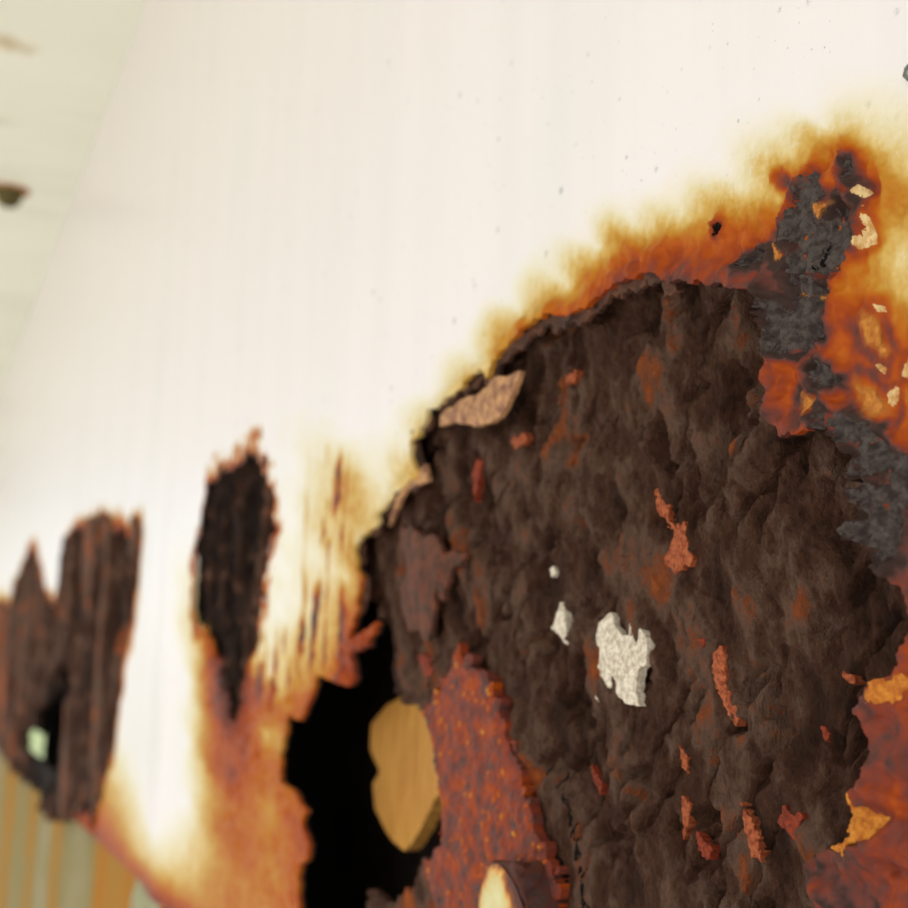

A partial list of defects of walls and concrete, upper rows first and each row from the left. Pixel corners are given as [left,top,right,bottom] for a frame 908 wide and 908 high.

rust [777,171,852,276]
rust [841,159,853,177]
rust [850,184,873,198]
rust [851,213,878,250]
rust [365,272,908,908]
spalling [333,591,442,908]
rust [0,752,94,908]
rust [89,838,137,908]
peeling [131,879,160,908]